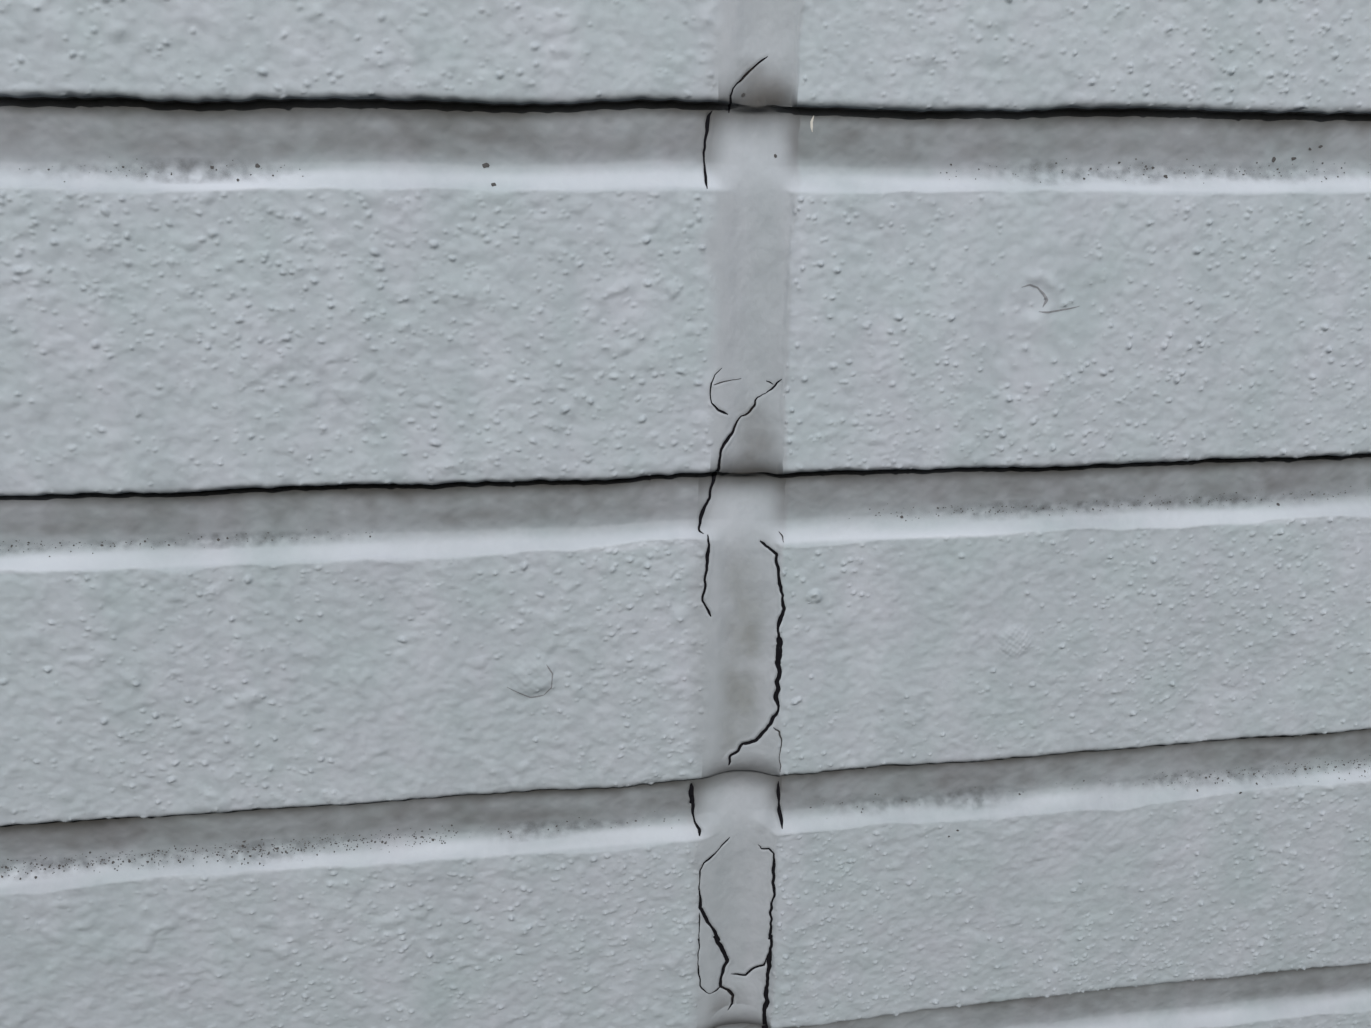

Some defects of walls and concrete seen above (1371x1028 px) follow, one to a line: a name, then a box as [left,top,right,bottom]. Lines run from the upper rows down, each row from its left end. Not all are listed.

crack [702,56,768,189]
crack [698,368,782,617]
crack [688,532,786,1028]